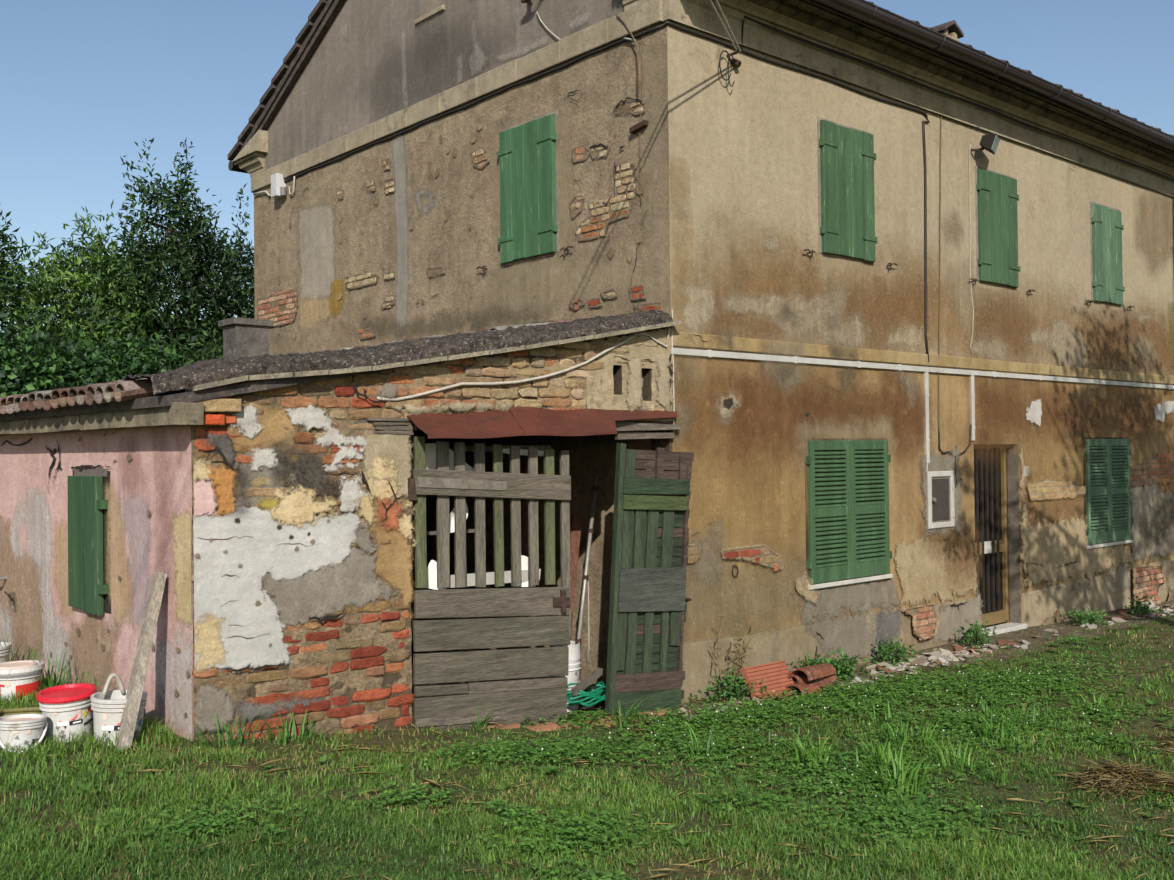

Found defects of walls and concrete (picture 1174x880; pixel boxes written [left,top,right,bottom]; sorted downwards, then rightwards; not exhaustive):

flaking render [569,143,637,259]
water stain [1137,194,1173,268]
flaking render [256,288,298,327]
water stain [706,250,1174,386]
spalling [719,394,740,418]
flaking render [1026,399,1042,427]
flaking render [1154,401,1174,422]
peeling [172,504,365,678]
flaking render [721,544,784,571]
spalling [795,571,819,605]
flaking render [895,530,979,640]
flaking render [1018,434,1174,607]